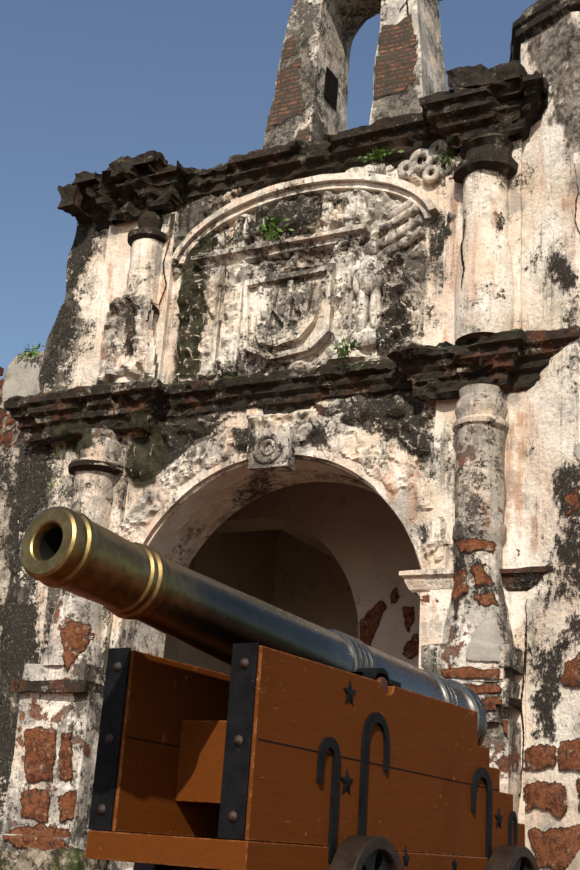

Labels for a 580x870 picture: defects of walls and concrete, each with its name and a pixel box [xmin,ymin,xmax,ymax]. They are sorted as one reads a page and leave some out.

spalling [265,36,310,142]
spalling [373,14,418,100]
leakage [521,6,580,151]
crack [572,163,580,233]
crack [458,223,466,288]
spalling [451,537,500,606]
spalling [60,620,97,672]
spalling [359,587,419,659]
spalling [559,652,580,688]
spalling [2,726,79,851]
spalling [522,738,580,870]